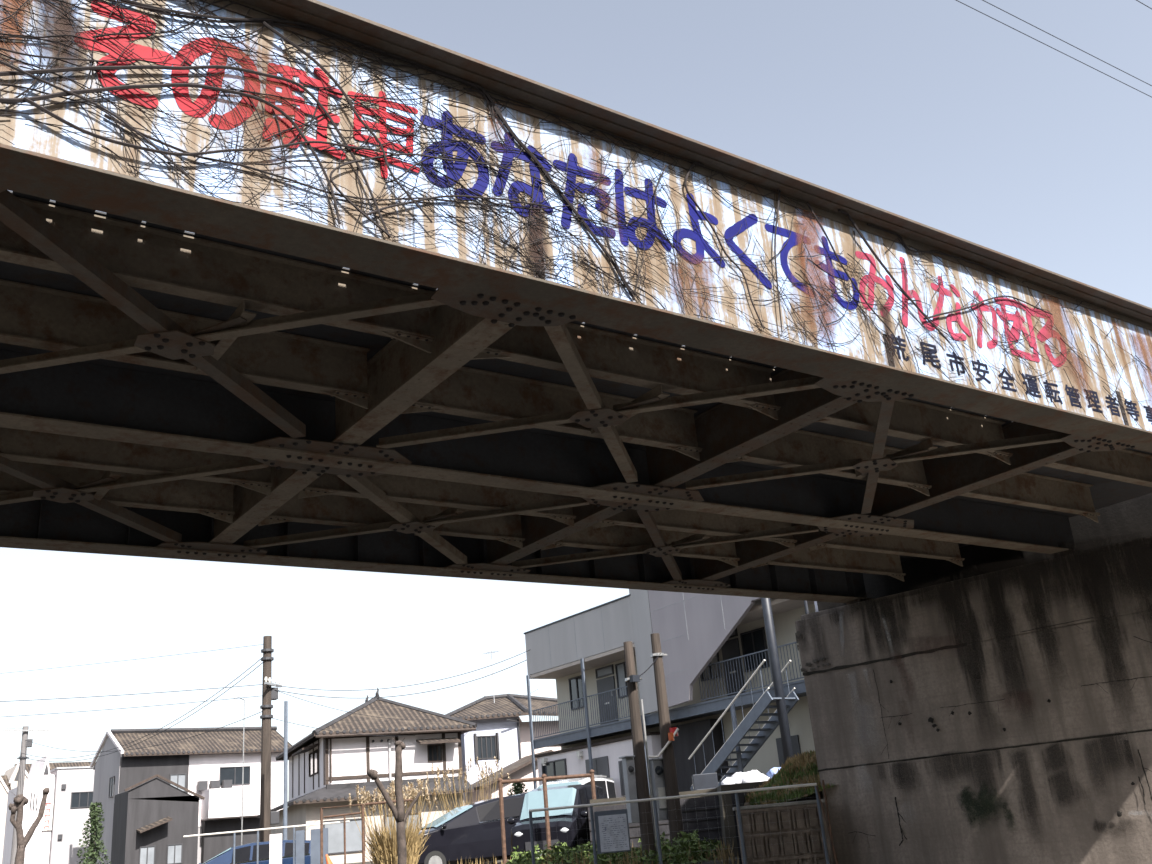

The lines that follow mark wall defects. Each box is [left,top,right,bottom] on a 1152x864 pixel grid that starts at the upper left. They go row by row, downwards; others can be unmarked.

corrosion [881,307,894,358]
water stain [831,534,1152,709]
water stain [934,752,1037,827]
water stain [1042,744,1078,803]
crack [1138,749,1152,805]